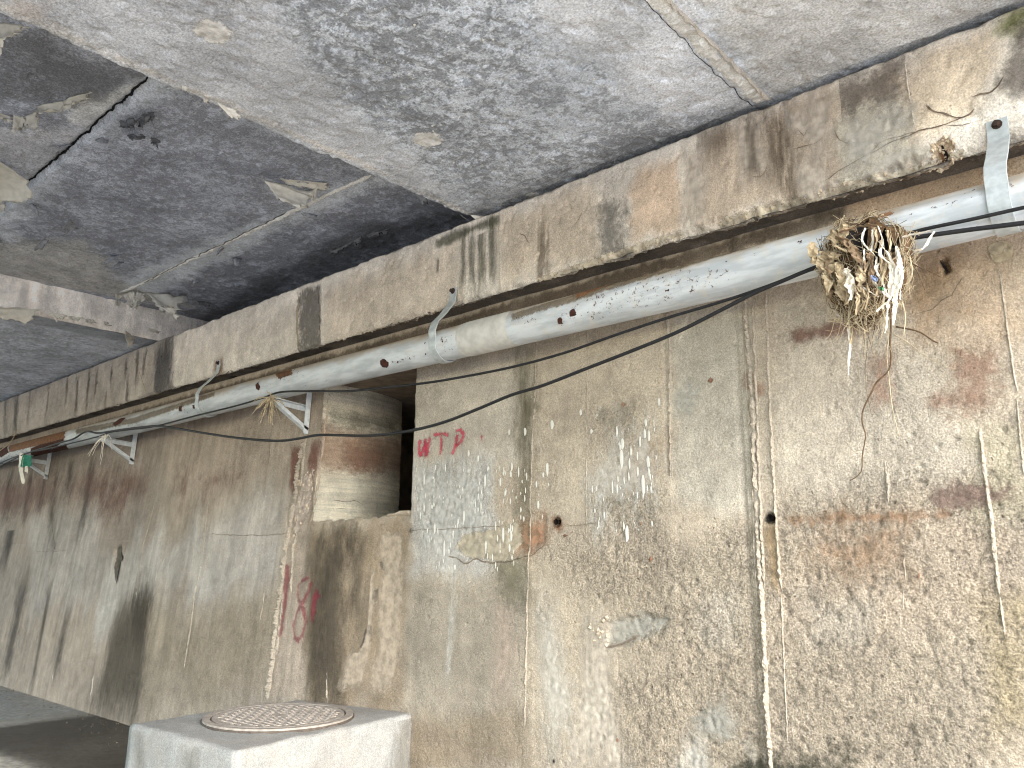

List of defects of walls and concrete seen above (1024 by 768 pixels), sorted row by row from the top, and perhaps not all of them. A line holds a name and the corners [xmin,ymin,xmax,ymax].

peeling [0,91,92,134]
peeling [0,162,39,216]
peeling [265,178,330,218]
spalling [718,135,964,229]
water stain [462,221,493,280]
peeling [115,280,211,320]
spalling [588,616,640,648]